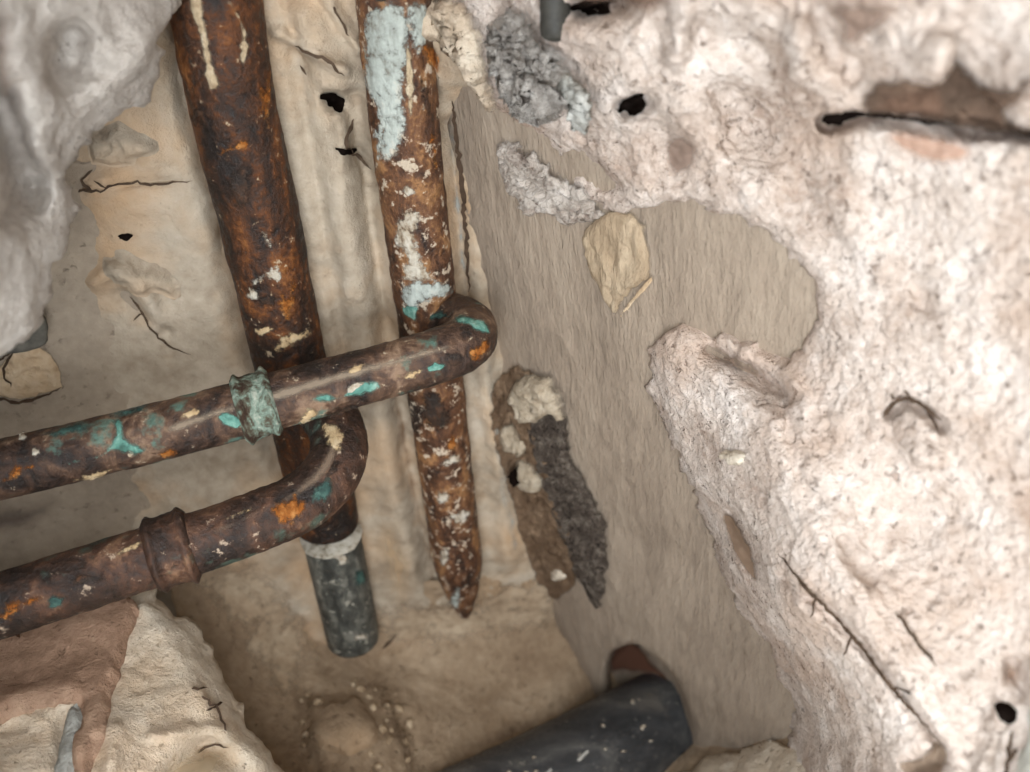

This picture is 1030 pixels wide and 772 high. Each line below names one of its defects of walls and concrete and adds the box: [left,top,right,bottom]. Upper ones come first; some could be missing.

crack [821,111,956,126]
crack [78,170,190,193]
spalling [668,139,693,170]
flaking render [582,212,653,317]
crack [130,297,190,355]
spalling [490,365,608,609]
spalling [724,515,756,579]
crack [778,554,945,747]